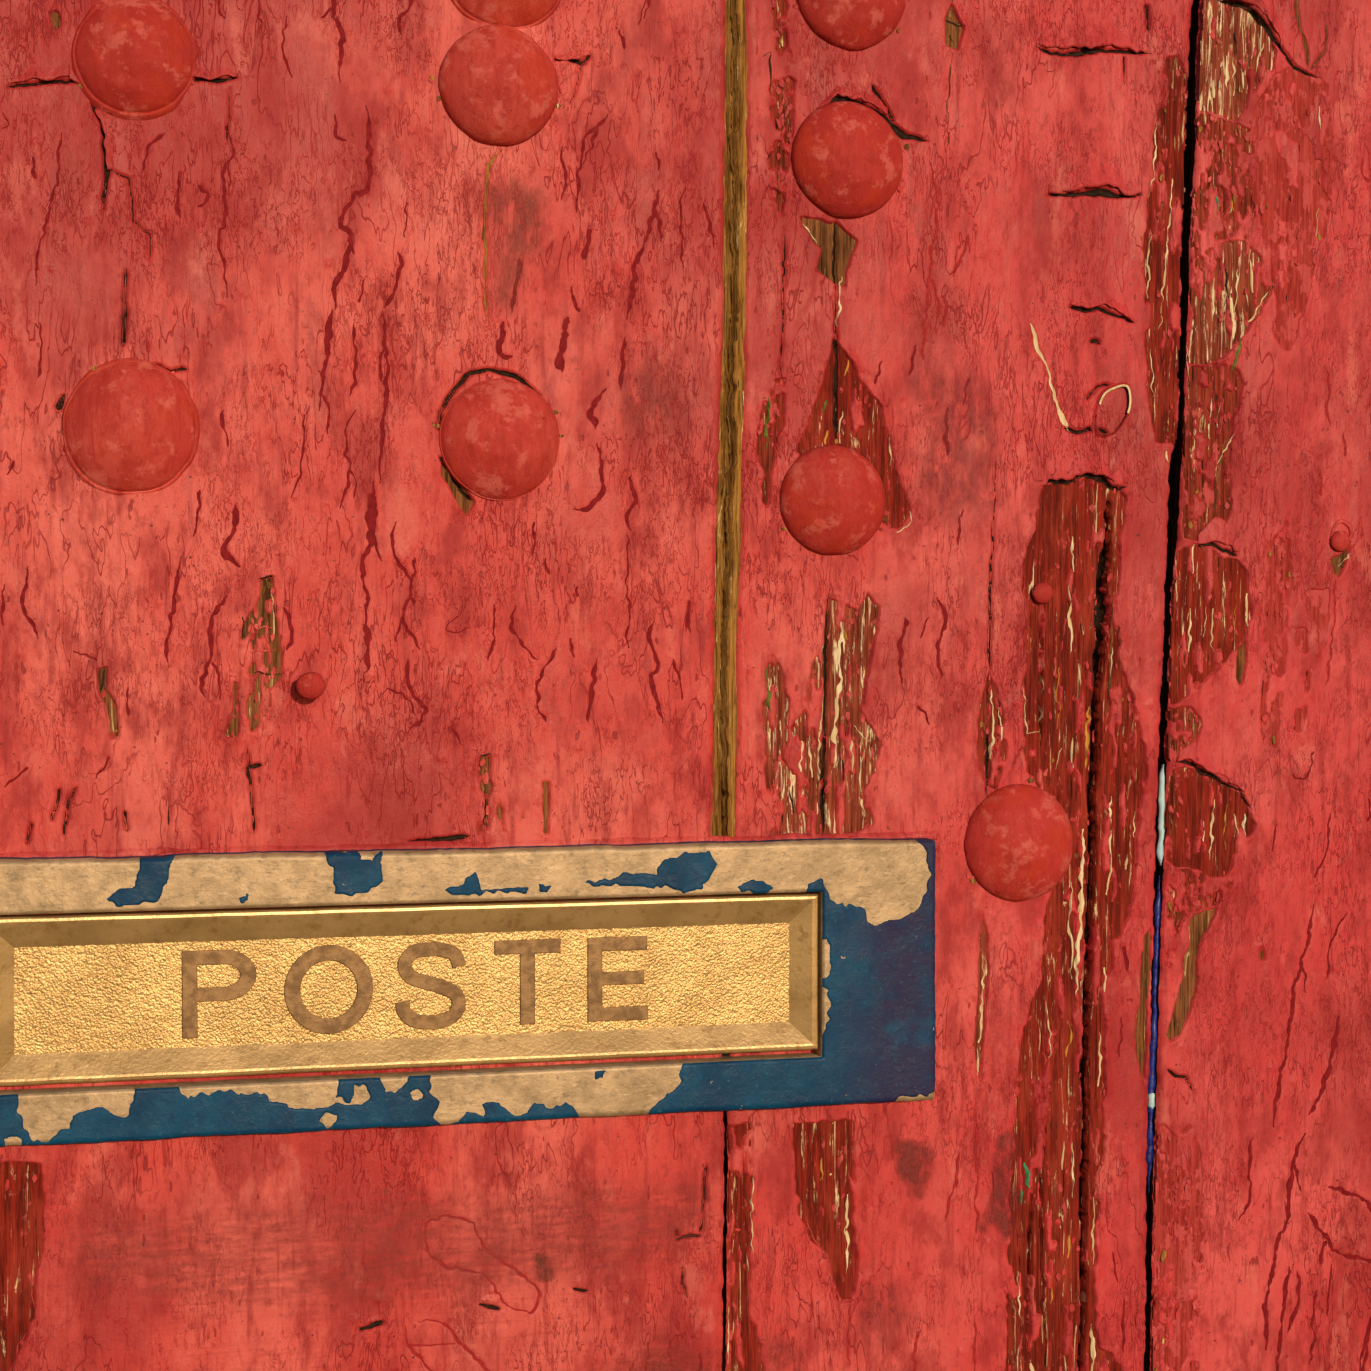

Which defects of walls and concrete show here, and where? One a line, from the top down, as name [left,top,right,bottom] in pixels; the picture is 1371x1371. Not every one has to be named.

crack [1036,5,1151,84]
crack [2,65,165,347]
crack [164,490,241,700]
peeling [0,575,931,926]
crack [291,0,715,745]
peeling [797,218,912,533]
crack [1030,323,1128,490]
peeling [1090,0,1352,1075]
peeling [1005,478,1145,1371]
peeling [0,1089,135,1371]
peeling [792,1119,858,1305]
crack [1238,814,1371,1371]